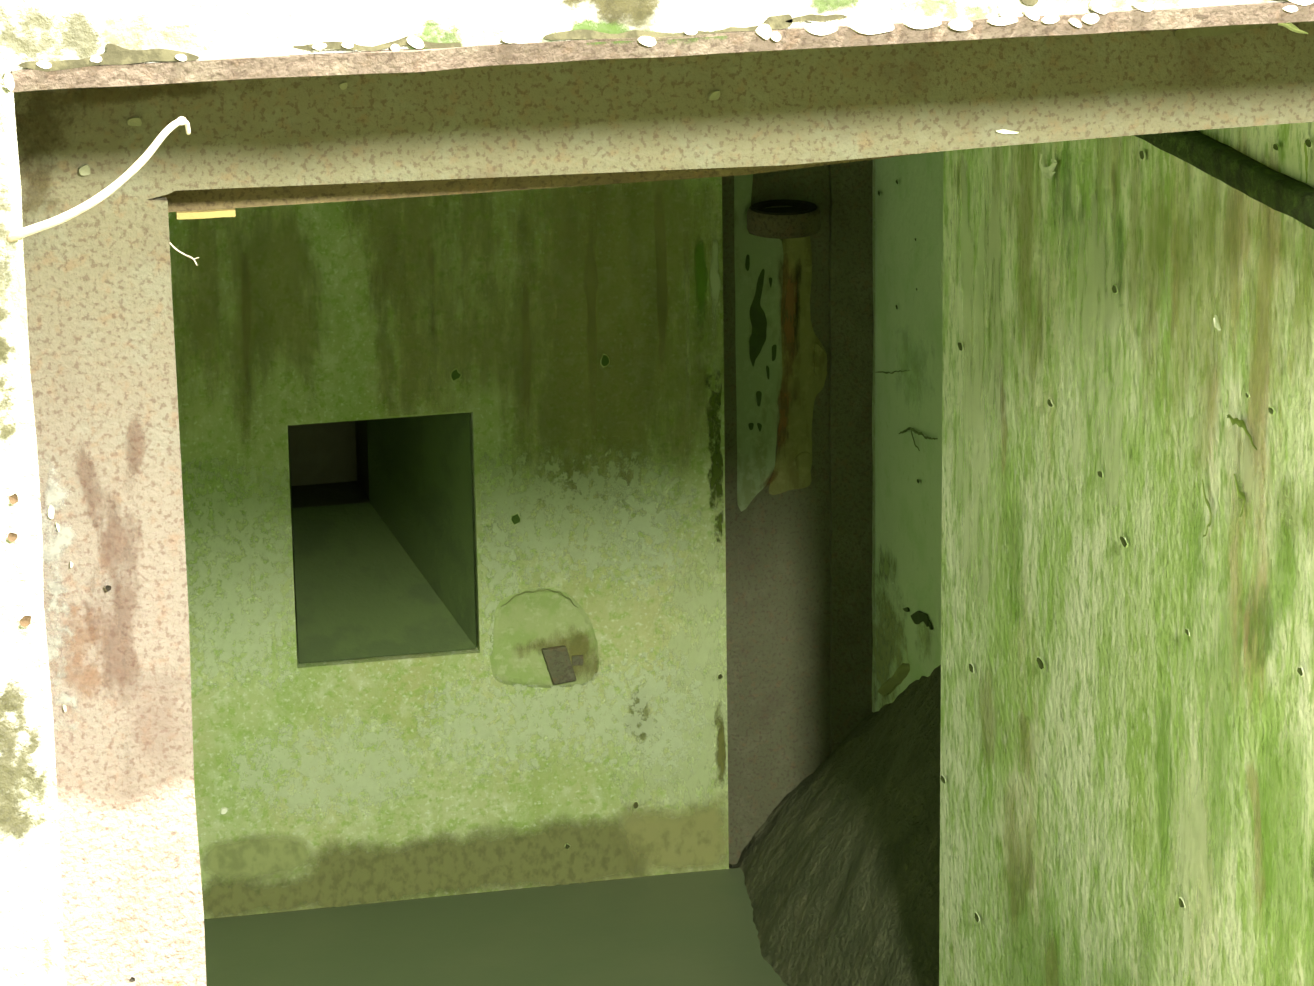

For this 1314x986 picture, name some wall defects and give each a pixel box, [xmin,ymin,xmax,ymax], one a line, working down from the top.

water stain [189,219,218,353]
peeling [734,174,827,512]
corrosion [777,262,801,451]
water stain [181,460,296,689]
water stain [202,180,728,919]